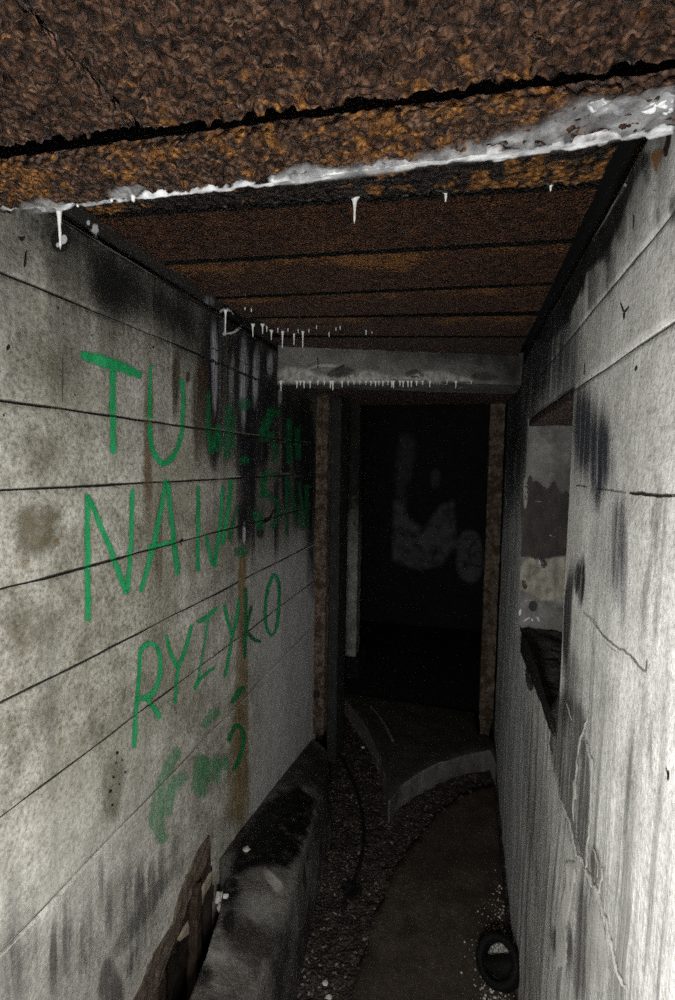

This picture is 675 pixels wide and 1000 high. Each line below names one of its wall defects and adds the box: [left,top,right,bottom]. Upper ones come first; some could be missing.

damp [2,88,675,212]
crack [662,134,671,157]
damp [207,304,470,571]
damp [575,397,624,600]
corrosion [232,555,246,818]
crack [583,612,647,673]
crack [560,703,625,987]